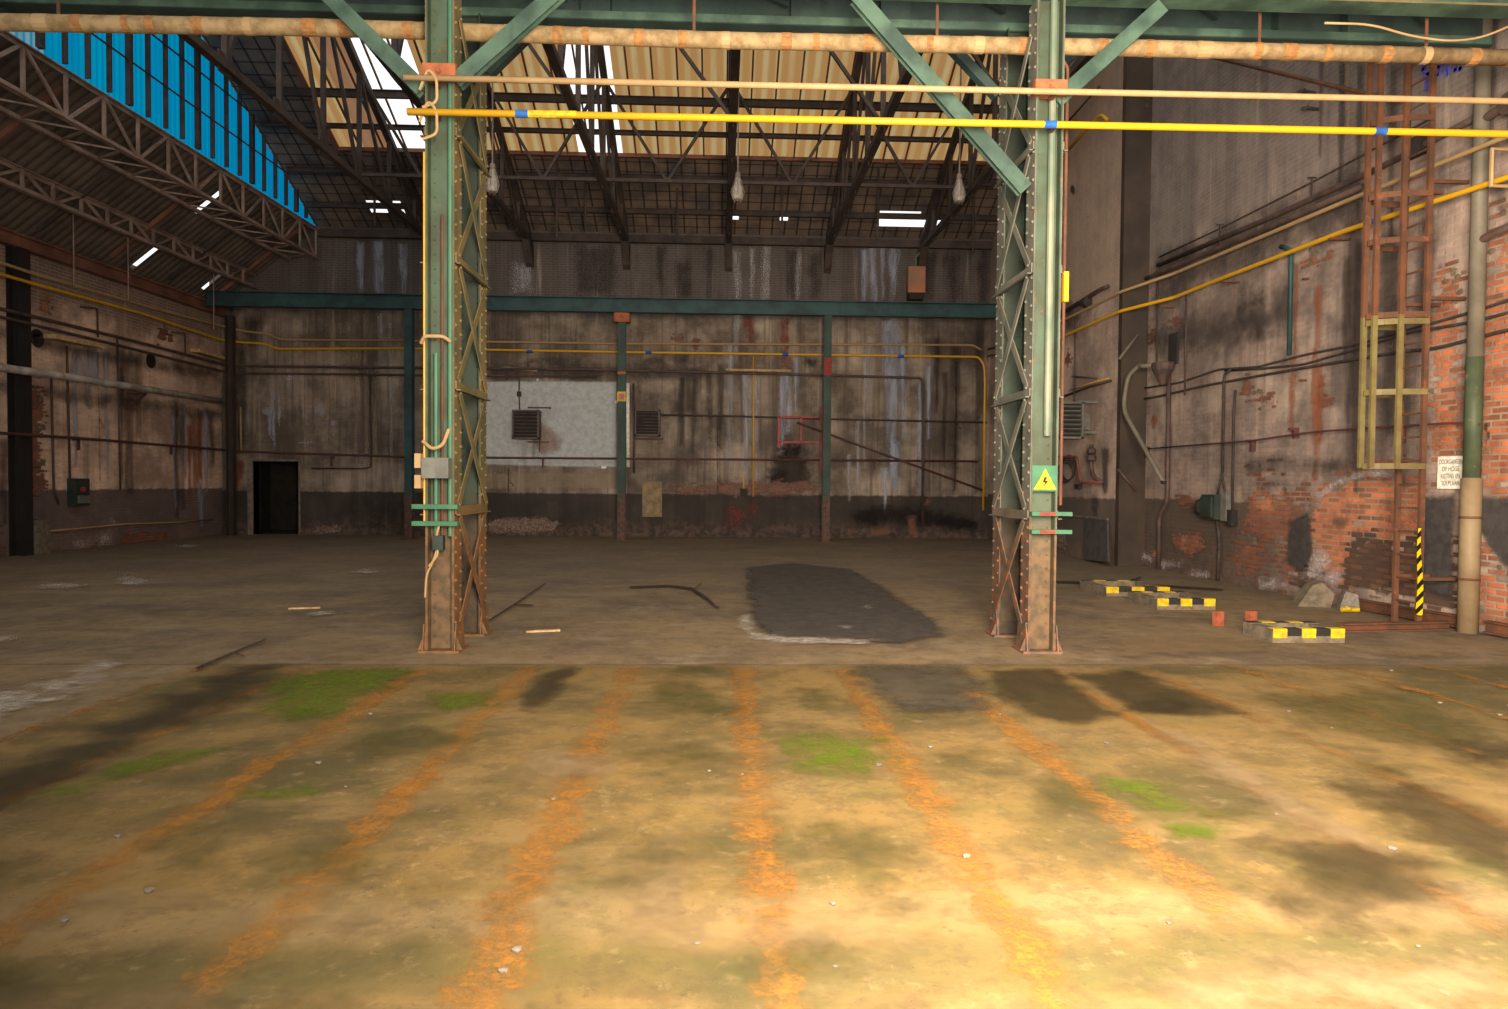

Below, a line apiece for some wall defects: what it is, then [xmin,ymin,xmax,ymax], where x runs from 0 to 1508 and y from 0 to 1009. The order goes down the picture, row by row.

leakage [862,248,898,297]
spalling [1300,248,1333,268]
leakage [781,359,798,452]
leakage [883,324,931,504]
spalling [1240,373,1276,410]
peeling [1427,260,1468,462]
peeling [1479,197,1508,626]
peeling [1229,454,1459,611]